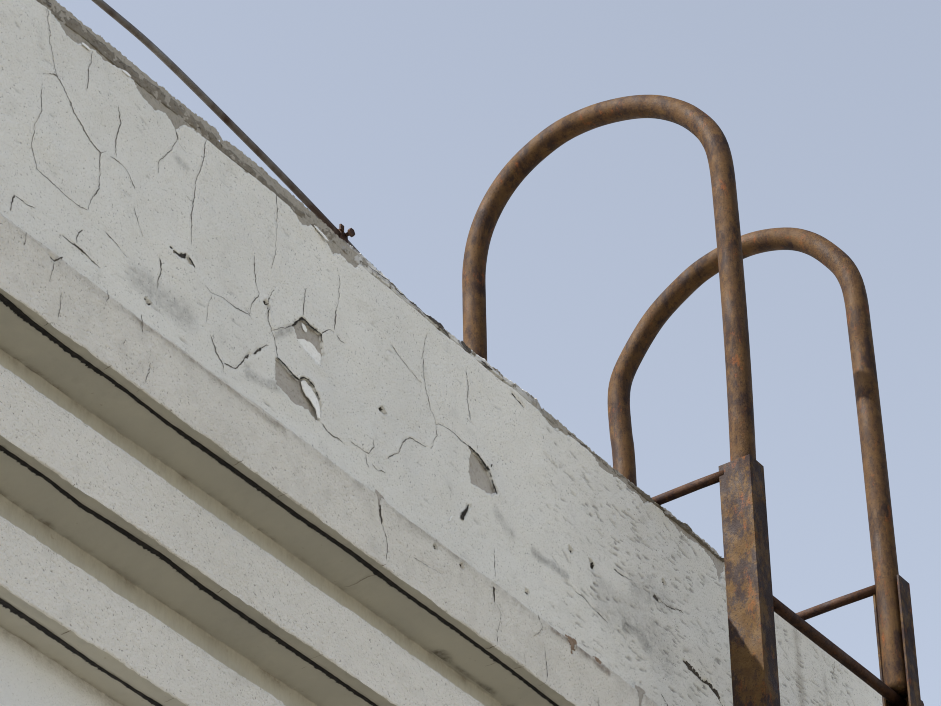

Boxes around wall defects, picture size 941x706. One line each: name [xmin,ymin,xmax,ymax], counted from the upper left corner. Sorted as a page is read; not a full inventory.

crack [31,0,143,326]
crack [158,127,207,242]
crack [207,161,306,369]
peeling [275,357,320,420]
peeling [292,317,323,365]
peeling [468,445,497,494]